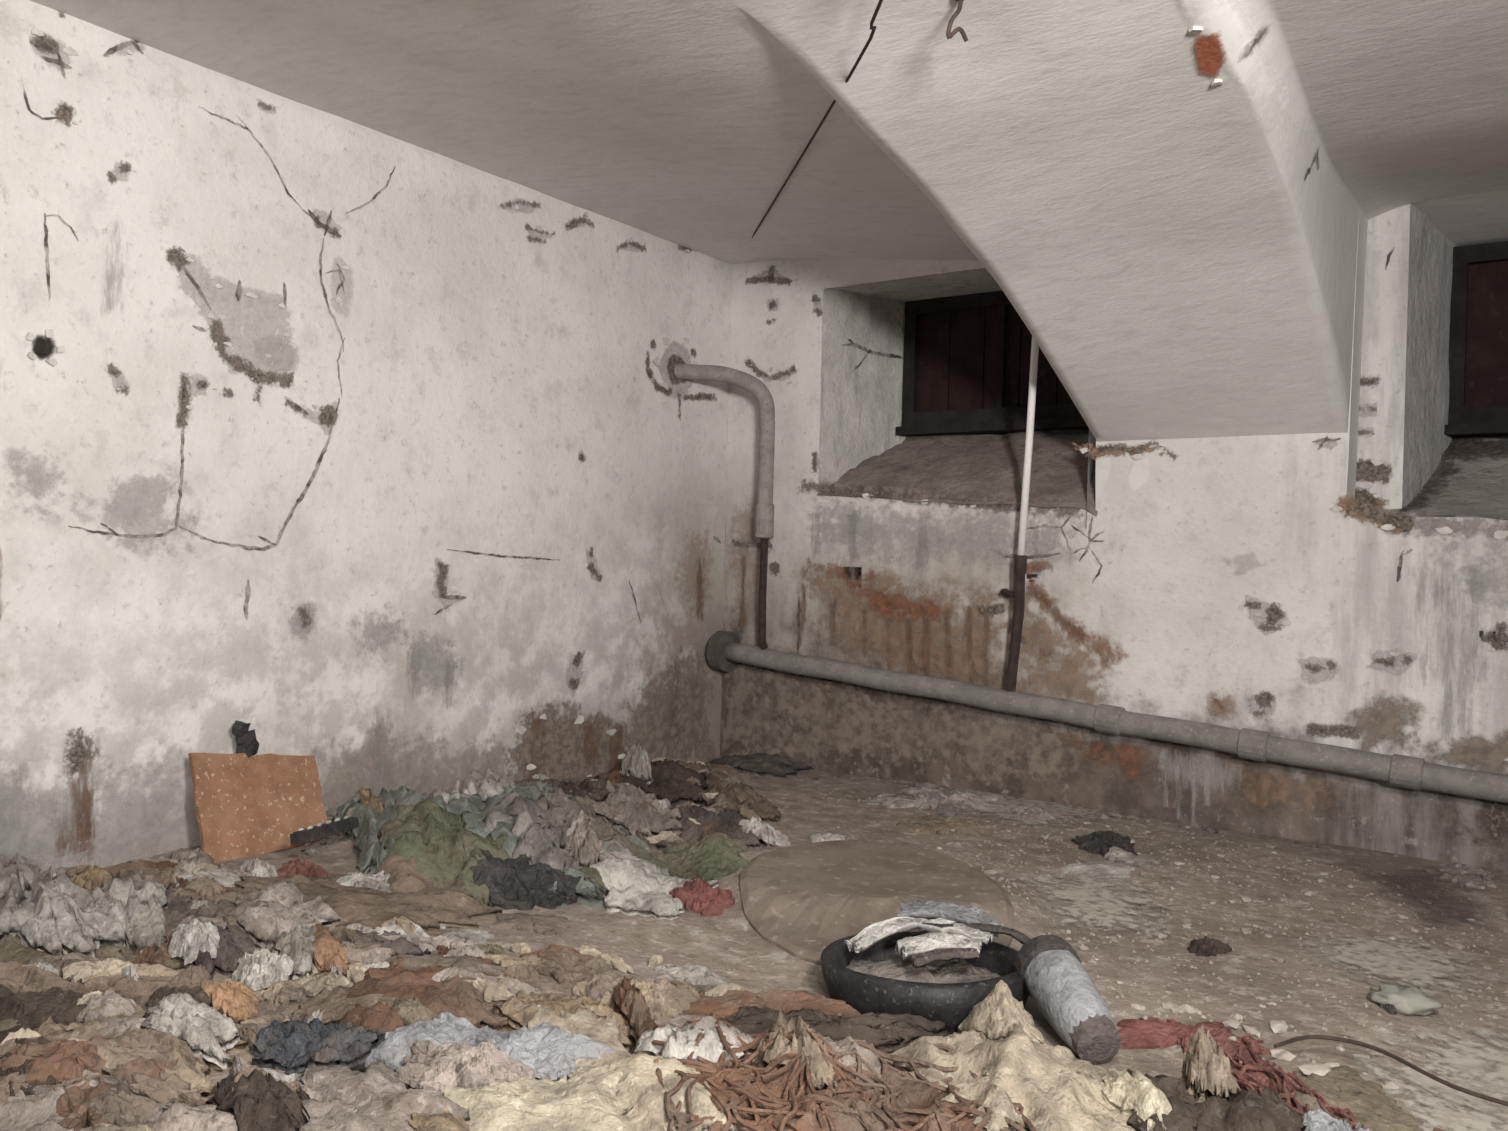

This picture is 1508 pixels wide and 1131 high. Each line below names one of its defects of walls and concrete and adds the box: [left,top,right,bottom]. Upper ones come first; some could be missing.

spalling [1189,25,1268,87]
crack [68,109,395,615]
spalling [167,247,338,434]
spalling [1358,403,1376,436]
spalling [1360,377,1379,386]
corrosion [798,561,1123,705]
spalling [1245,595,1291,634]
spalling [1481,622,1508,652]
water stain [315,725,509,809]
water stain [0,765,178,868]